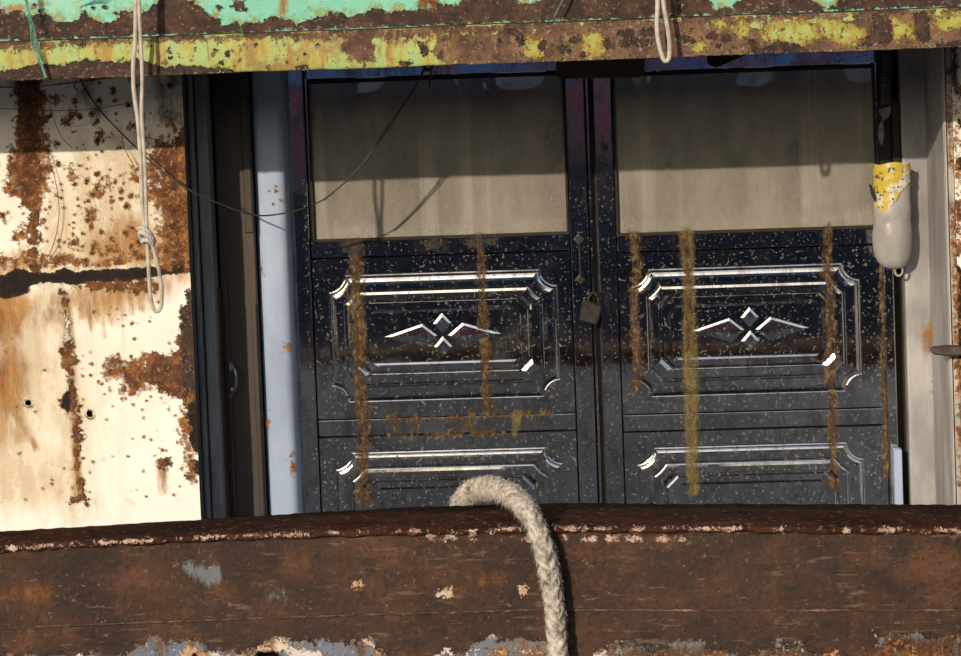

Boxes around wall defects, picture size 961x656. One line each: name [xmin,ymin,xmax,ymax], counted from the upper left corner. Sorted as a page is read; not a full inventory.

peeling [522,35,548,60]
peeling [580,29,608,60]
peeling [711,17,869,48]
peeling [890,16,917,43]
peeling [931,11,961,37]
damp [340,232,554,506]
damp [628,231,645,396]
damp [680,227,698,495]
damp [820,223,840,492]
peeling [127,635,327,656]
rust [0,526,548,656]
rust [548,523,961,656]